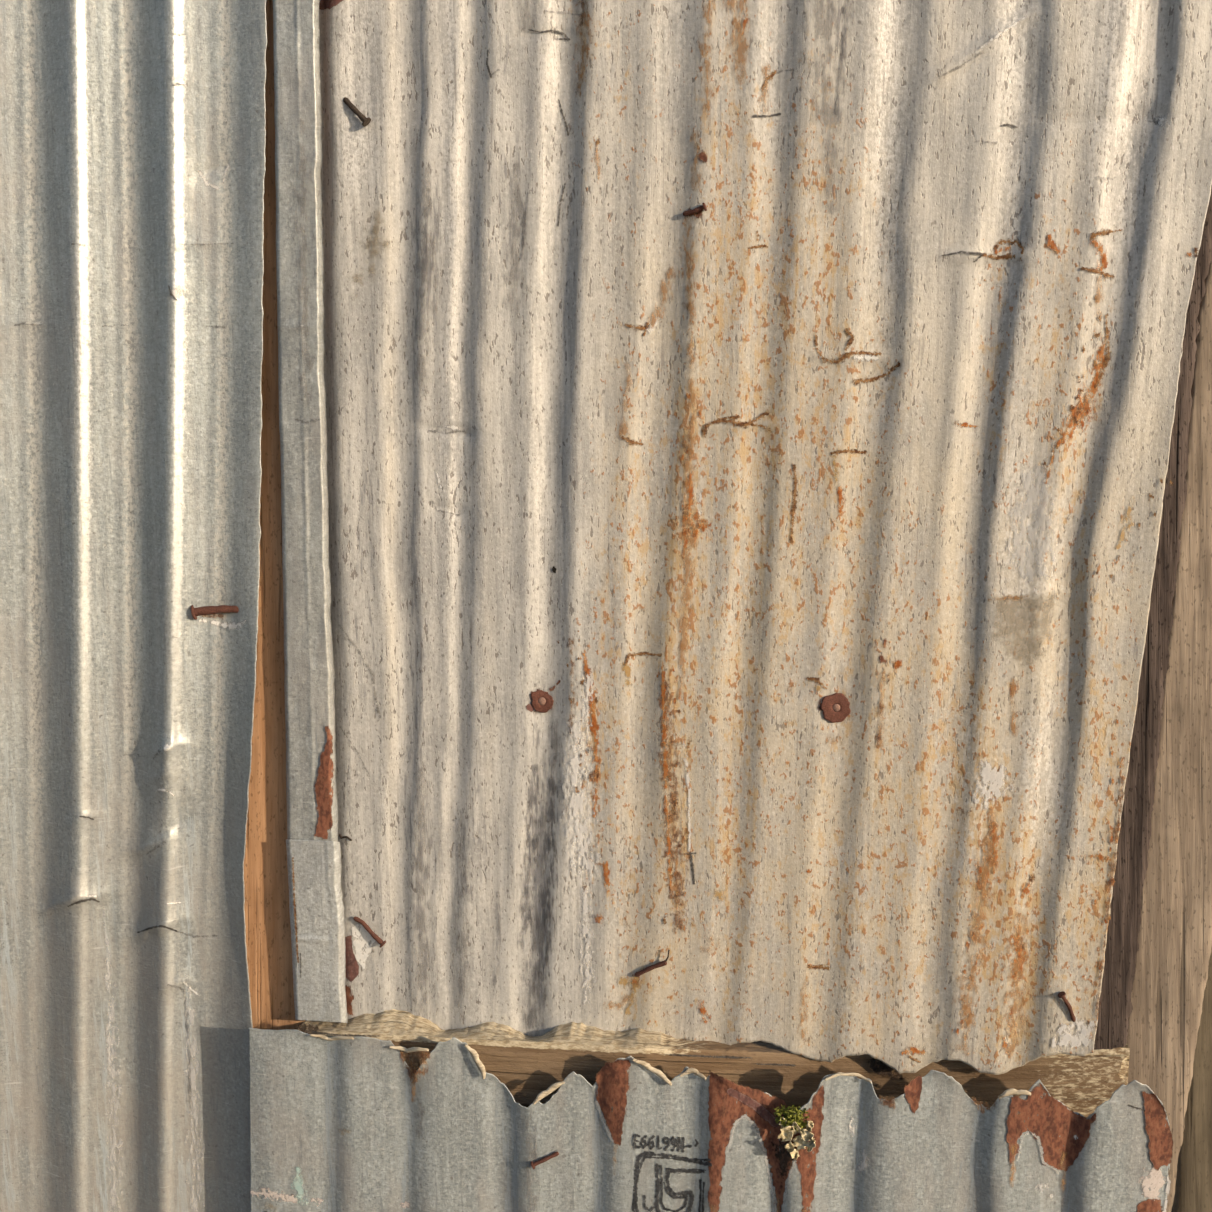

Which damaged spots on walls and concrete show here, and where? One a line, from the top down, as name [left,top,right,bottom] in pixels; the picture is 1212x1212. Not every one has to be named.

corrosion [319,0,343,10]
corrosion [1042,229,1122,484]
corrosion [830,449,867,516]
corrosion [622,341,711,932]
corrosion [314,726,334,839]
corrosion [956,809,1000,1051]
corrosion [1002,913,1029,1055]
corrosion [596,1060,631,1146]
corrosion [708,1071,825,1212]
corrosion [1006,1083,1096,1189]
corrosion [1128,1091,1173,1171]
corrosion [1137,1199,1163,1212]